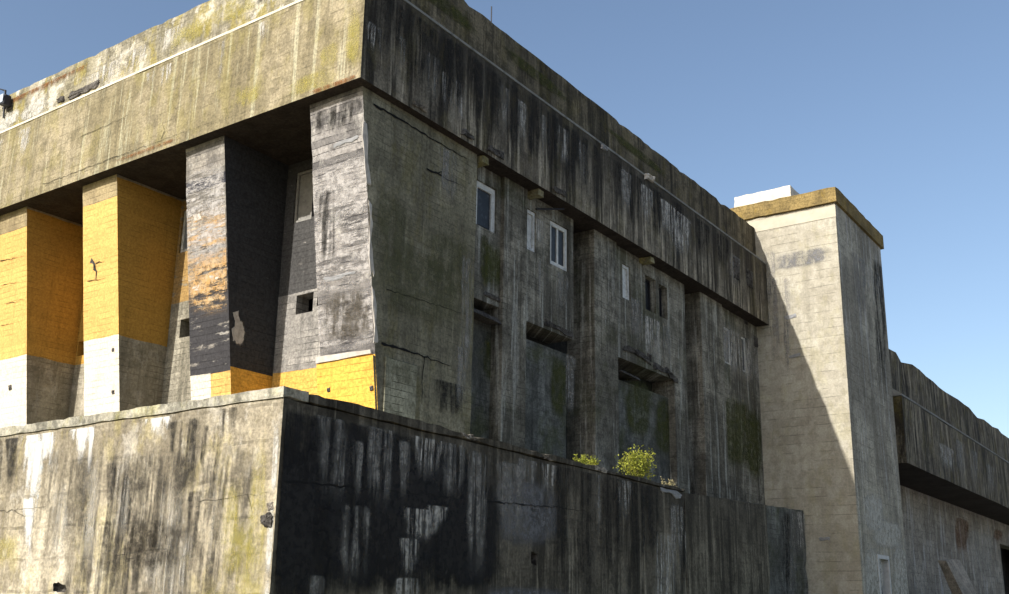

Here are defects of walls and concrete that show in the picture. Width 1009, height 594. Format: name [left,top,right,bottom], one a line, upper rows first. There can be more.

damp [368,0,597,178]
damp [610,163,740,281]
damp [436,258,472,411]
damp [57,427,96,531]
damp [106,416,224,594]
damp [275,413,686,594]
damp [726,402,761,475]